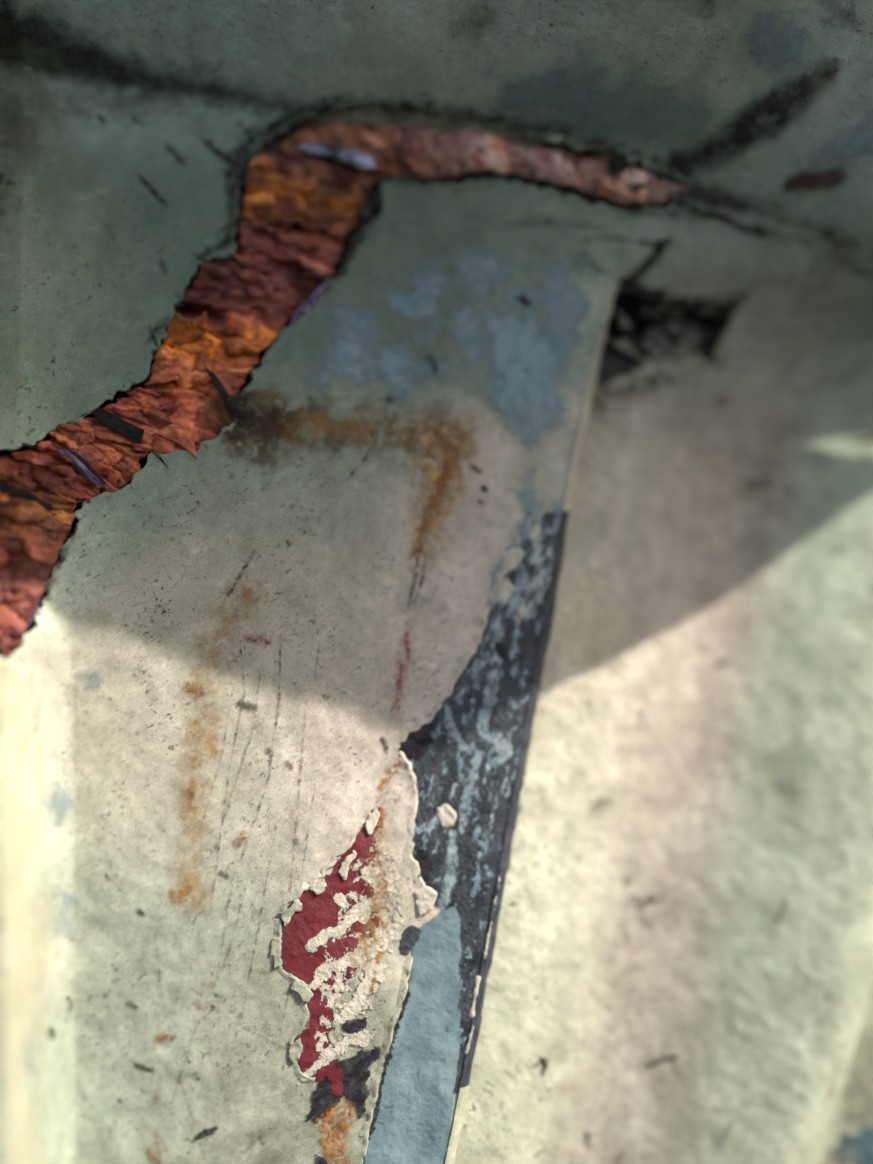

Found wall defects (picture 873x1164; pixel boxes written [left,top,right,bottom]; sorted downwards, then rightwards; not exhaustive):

crack [0,0,254,105]
crack [466,60,839,293]
peeling [597,339,642,385]
corrosion [211,390,471,605]
peeling [268,478,563,1164]
peeling [829,1117,873,1164]